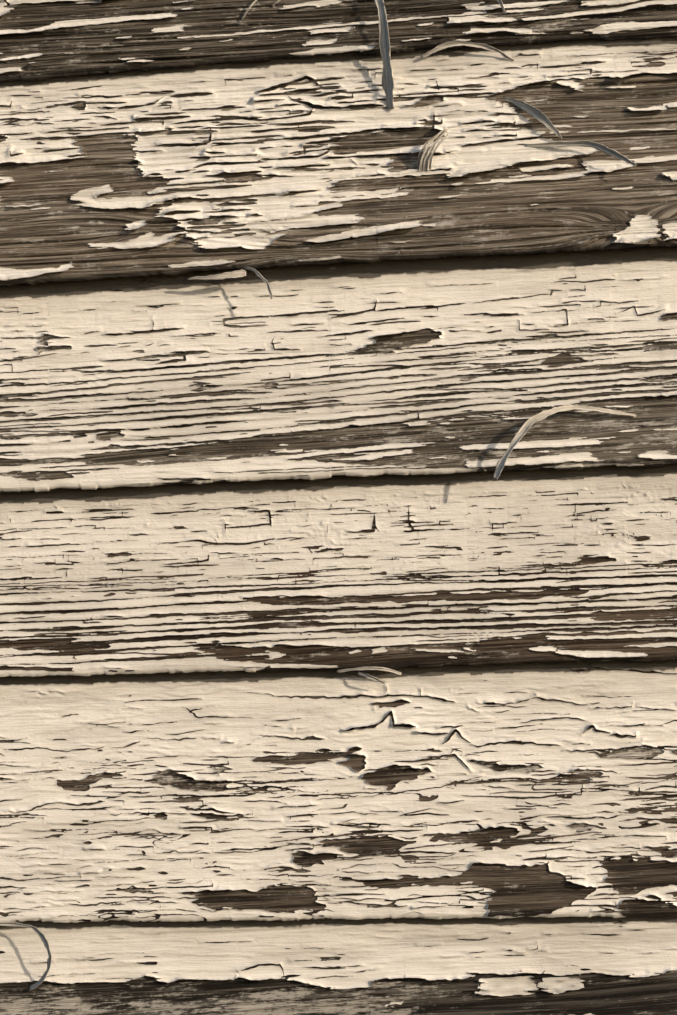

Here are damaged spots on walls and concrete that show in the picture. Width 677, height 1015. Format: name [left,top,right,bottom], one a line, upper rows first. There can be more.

peeling [0,0,677,81]
peeling [0,74,677,284]
crack [0,294,677,466]
peeling [0,395,677,481]
crack [0,502,677,666]
peeling [194,607,677,671]
crack [574,666,677,674]
crack [0,692,677,853]
crack [72,899,176,907]
peeling [181,885,326,913]
peeling [364,862,596,917]
peeling [0,970,677,1015]